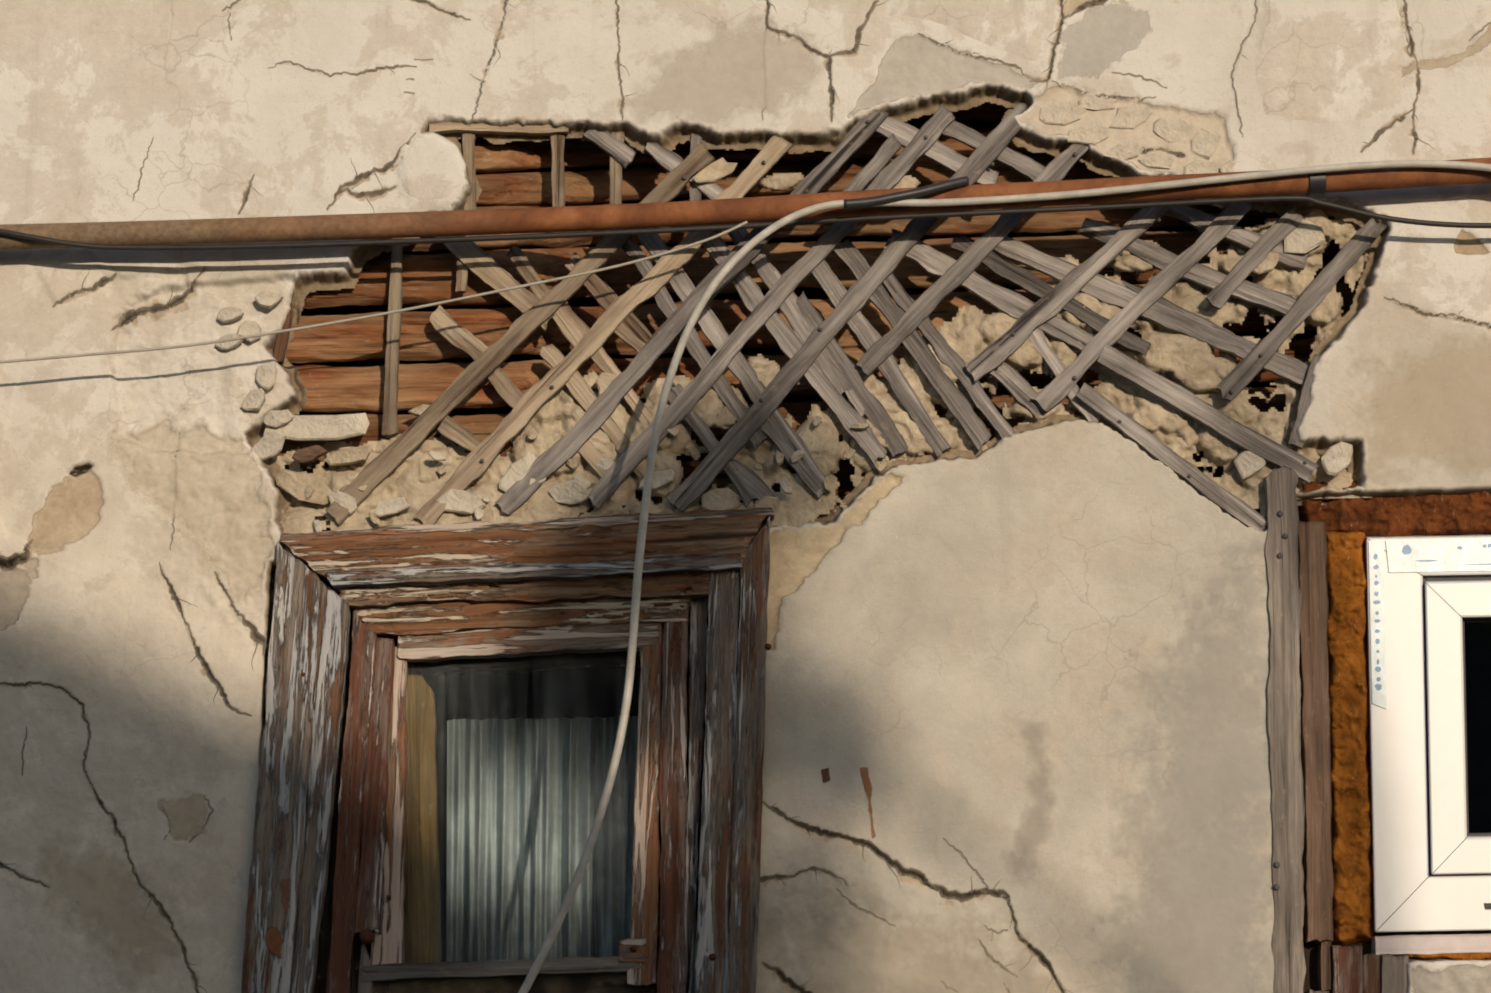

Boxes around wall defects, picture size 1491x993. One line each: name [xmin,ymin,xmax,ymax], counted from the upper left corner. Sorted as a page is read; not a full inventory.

crack [765,0,883,122]
crack [918,0,1167,103]
crack [326,132,416,211]
spalling [758,173,804,191]
crack [52,268,205,330]
spalling [1162,246,1377,354]
spalling [1203,208,1362,300]
spalling [1056,292,1372,499]
spalling [117,306,1280,650]
peeling [0,463,103,630]
crack [159,510,266,716]
crack [760,802,1073,993]